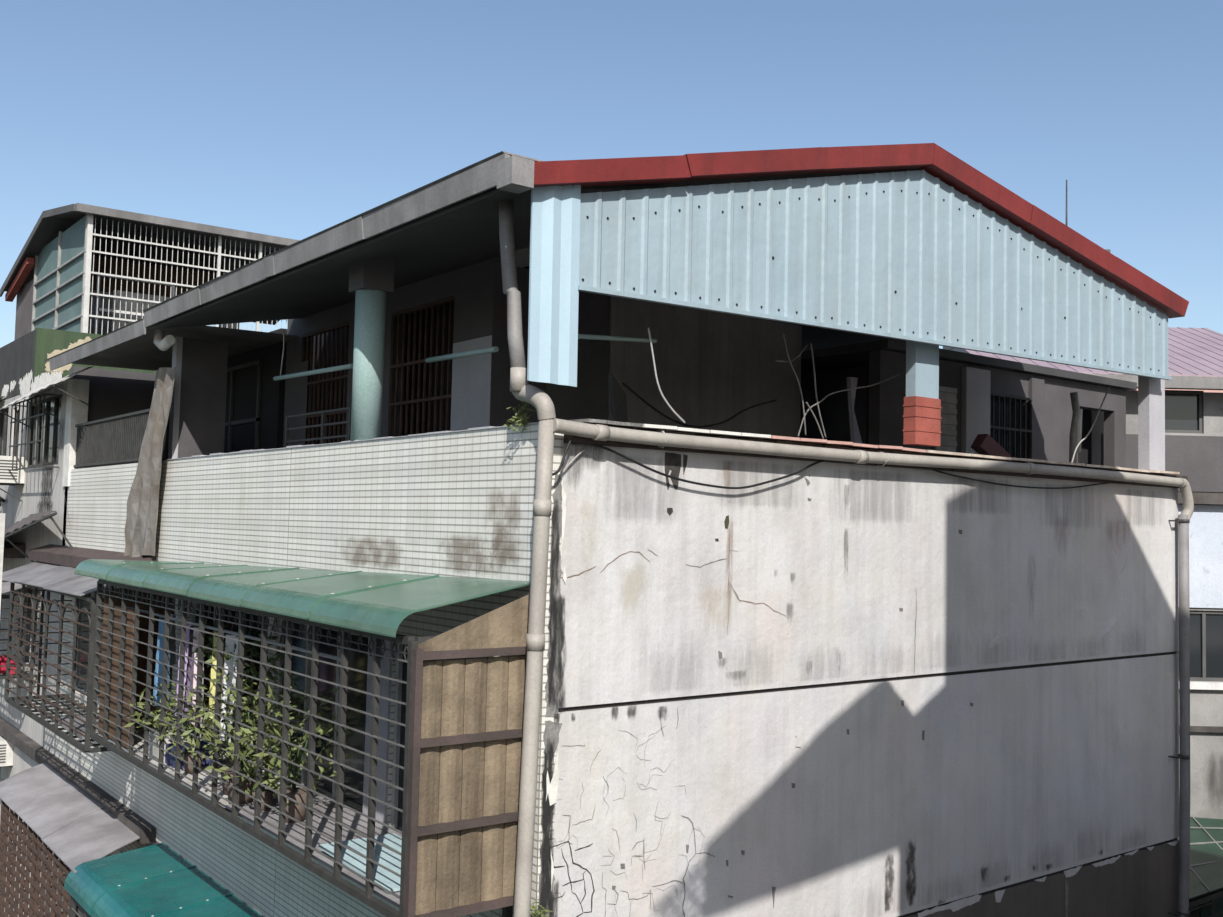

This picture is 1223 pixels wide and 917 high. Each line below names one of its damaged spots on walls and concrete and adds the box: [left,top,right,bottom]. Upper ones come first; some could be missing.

peeling [1,337,92,411]
crack [561,550,658,578]
crack [686,529,781,636]
peeling [537,474,567,917]
crack [531,717,715,917]
leakage [885,843,916,910]
peeling [917,889,1005,917]
peeling [1063,841,1178,877]